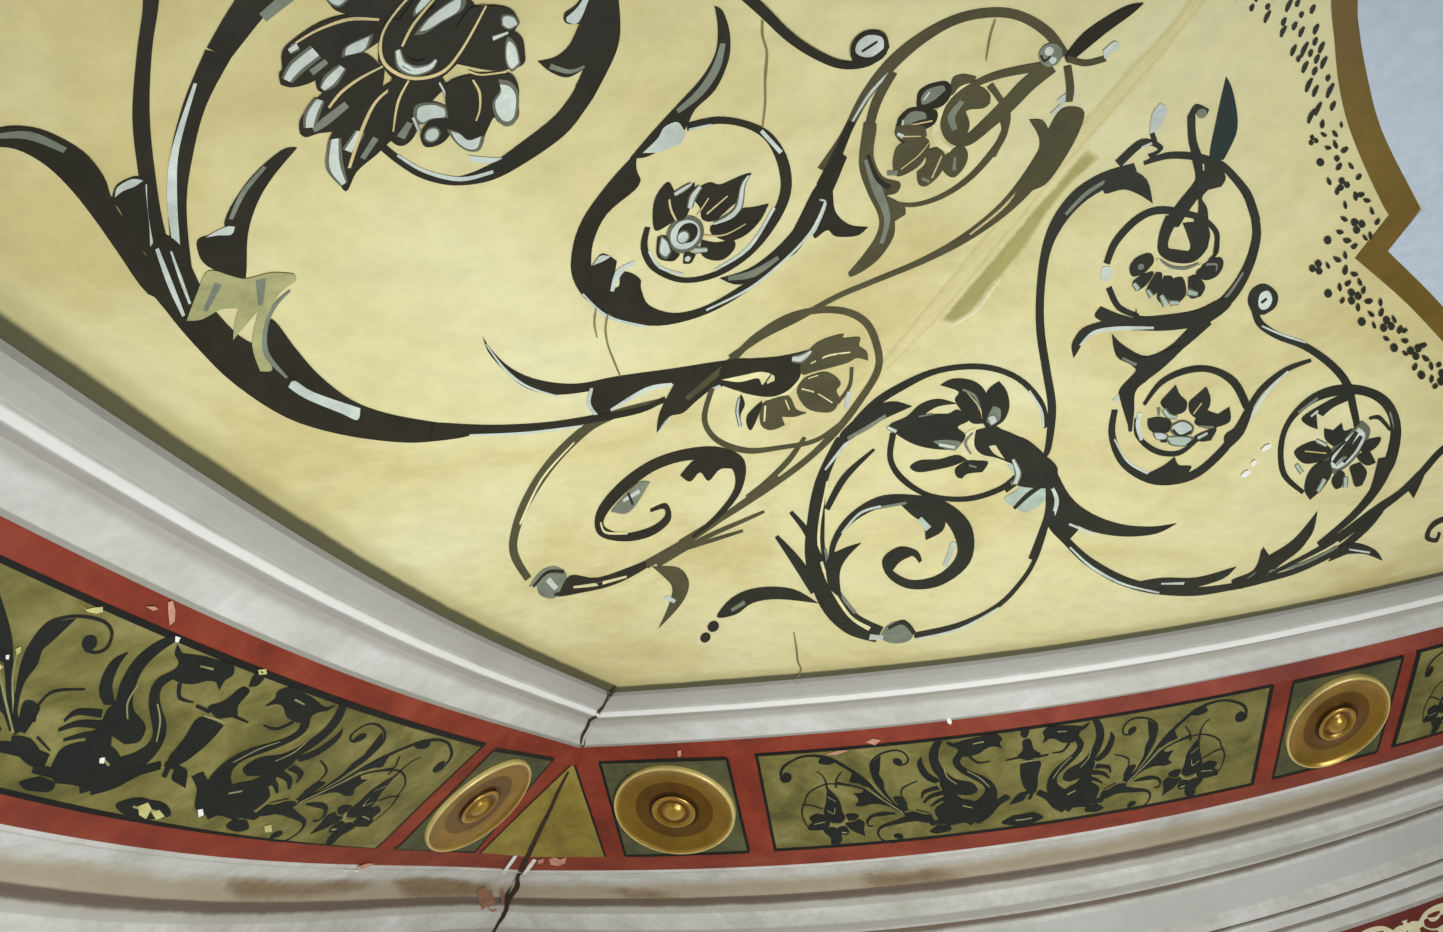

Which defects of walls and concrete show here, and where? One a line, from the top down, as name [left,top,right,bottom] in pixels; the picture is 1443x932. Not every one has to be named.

crack [493,687,618,932]